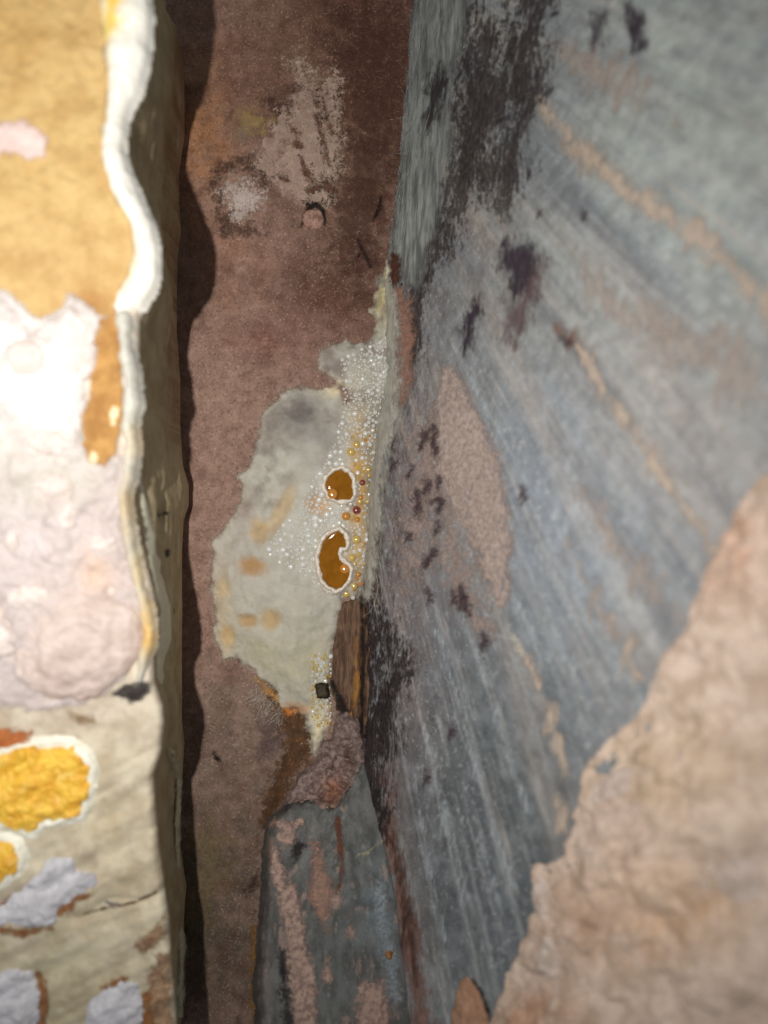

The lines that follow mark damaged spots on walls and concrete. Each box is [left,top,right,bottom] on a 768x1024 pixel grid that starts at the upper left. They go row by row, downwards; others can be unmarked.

leakage [403,0,768,366]
peeling [0,0,171,685]
leakage [418,424,439,456]
leakage [413,475,445,534]
leakage [421,548,437,570]
leakage [450,584,472,617]
corrosion [255,677,313,831]
spalling [451,472,768,1024]